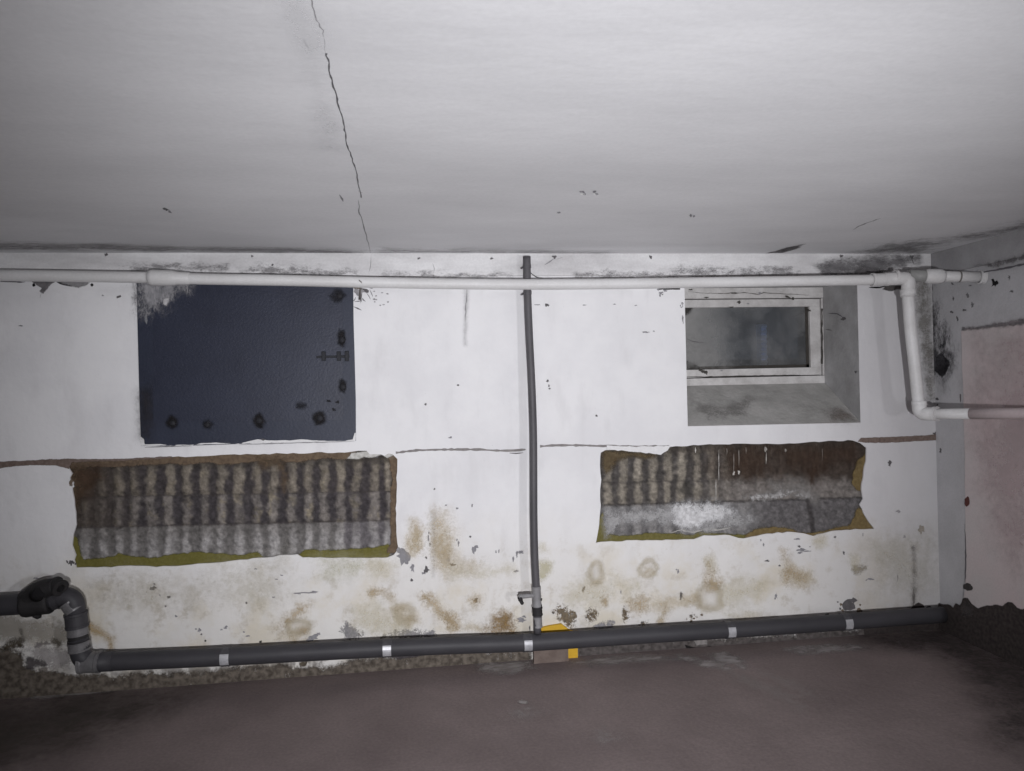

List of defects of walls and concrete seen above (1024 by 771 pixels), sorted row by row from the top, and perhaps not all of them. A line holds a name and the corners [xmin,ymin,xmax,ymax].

crack [303,0,371,271]
water stain [818,255,920,275]
water stain [917,282,939,406]
flaking render [66,451,431,581]
flaking render [596,440,873,554]
flaking render [0,633,531,699]
water stain [552,599,665,629]